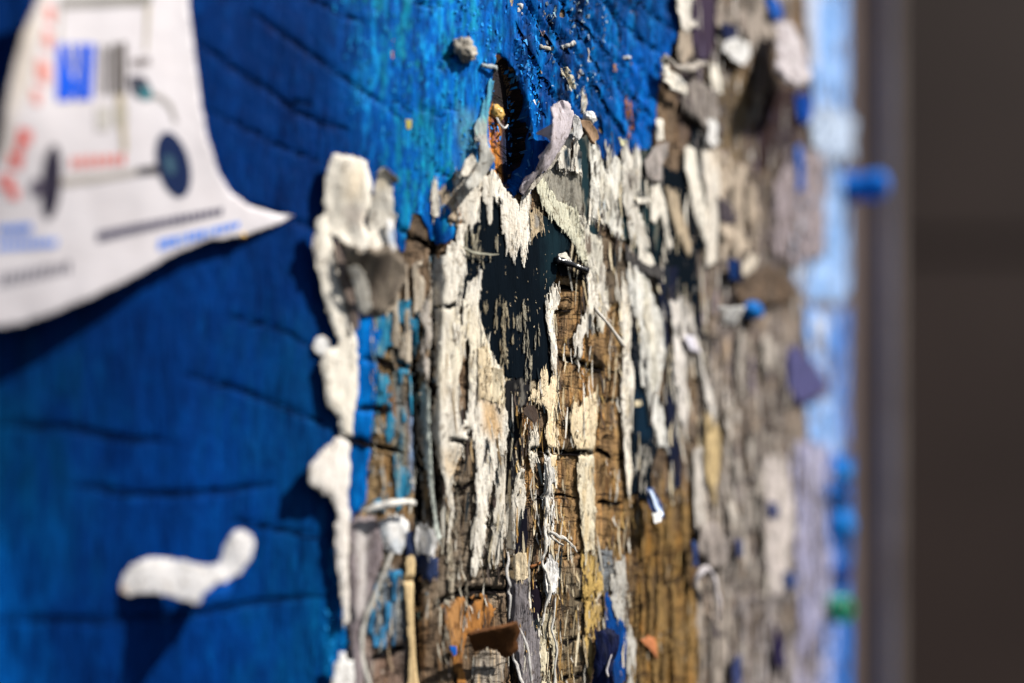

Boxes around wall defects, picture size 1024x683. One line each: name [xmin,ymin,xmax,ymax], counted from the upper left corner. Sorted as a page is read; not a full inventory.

peeling [342,0,608,177]
peeling [723,35,751,67]
peeling [393,50,460,222]
peeling [601,233,626,304]
peeling [727,258,742,281]
peeling [362,258,432,514]
peeling [787,343,828,405]
peeling [368,570,405,649]
peeling [505,549,560,683]
peeling [580,550,627,683]
peeling [691,518,744,569]
peeling [784,569,797,590]